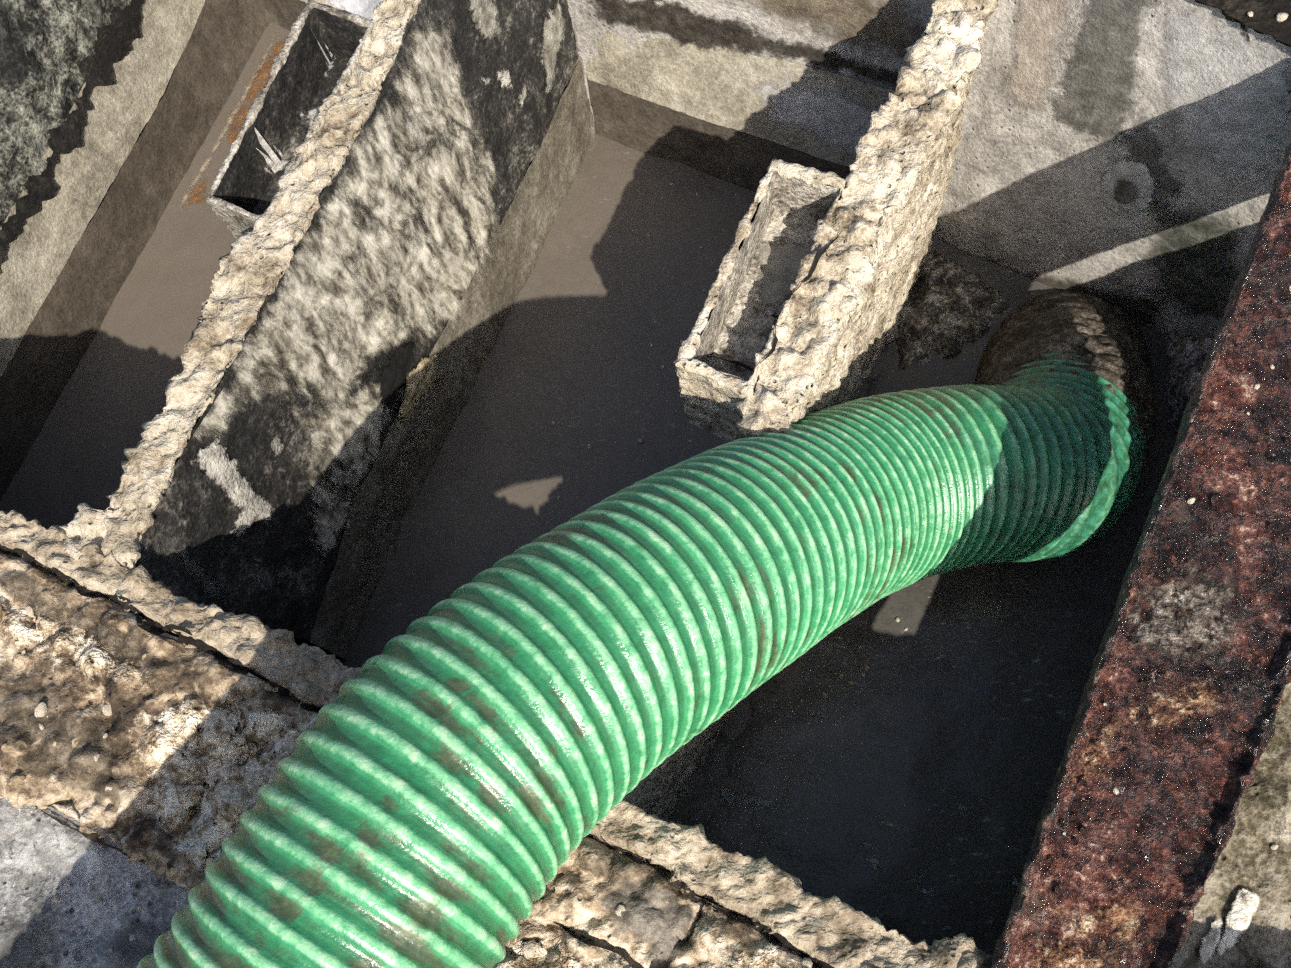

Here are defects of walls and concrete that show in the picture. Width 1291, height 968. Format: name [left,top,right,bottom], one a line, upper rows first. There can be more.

damp [588,0,926,88]
rust [182,42,285,204]
damp [1004,0,1291,323]
crack [681,229,843,372]
crack [0,544,321,713]
rust [1129,568,1235,662]
rust [1079,682,1220,777]
damp [0,813,108,886]
crack [554,838,833,968]
rust [1032,902,1141,968]